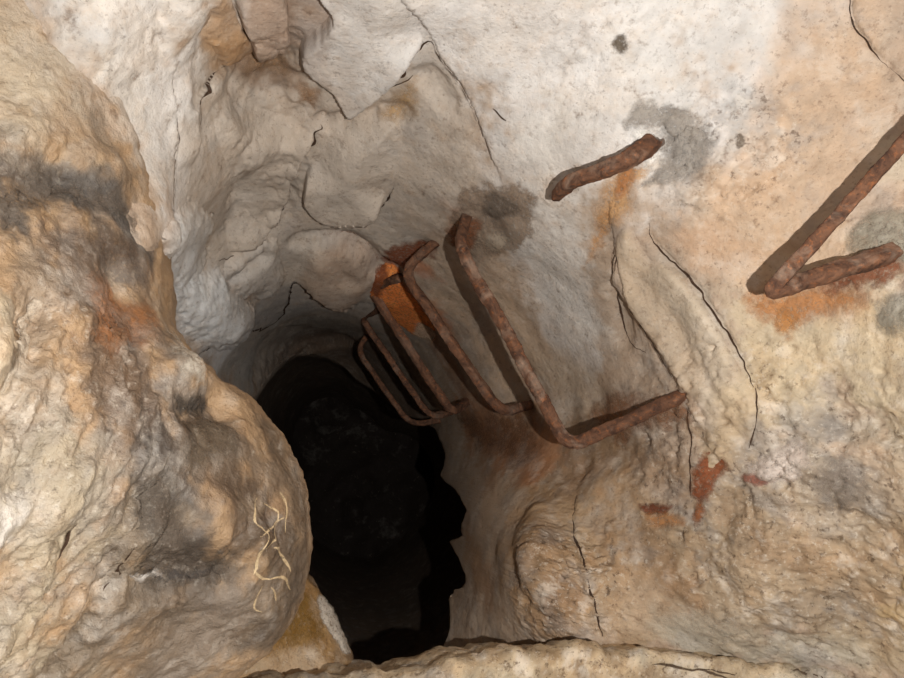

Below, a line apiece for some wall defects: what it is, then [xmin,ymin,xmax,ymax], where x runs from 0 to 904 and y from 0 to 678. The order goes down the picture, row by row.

crack [849,0,904,81]
crack [419,41,506,121]
damp [0,174,147,283]
corrosion [593,169,645,244]
corrosion [370,240,436,340]
corrosion [749,258,902,331]
crack [649,229,758,447]
corrosion [594,394,649,425]
corrosion [641,503,680,525]
corrosion [692,452,726,522]
crack [572,496,603,636]